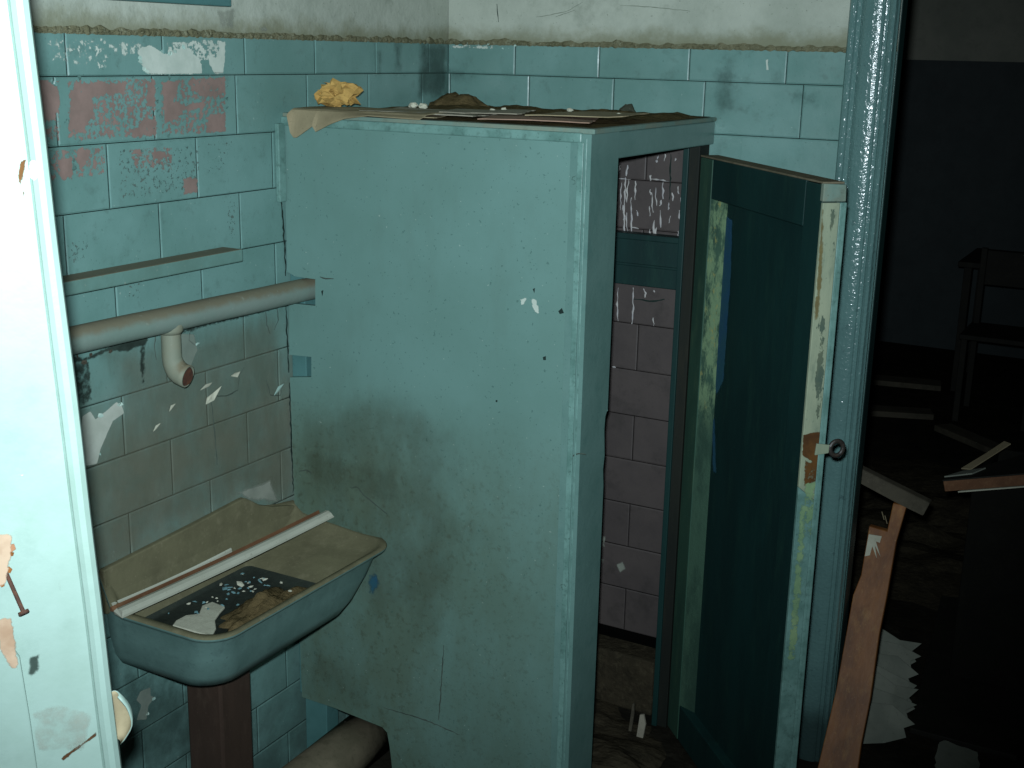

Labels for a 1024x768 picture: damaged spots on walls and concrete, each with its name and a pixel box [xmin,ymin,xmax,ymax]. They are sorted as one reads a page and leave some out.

peeling [29,38,232,198]
leakage [73,338,147,403]
peeling [201,382,221,404]
peeling [81,402,124,466]